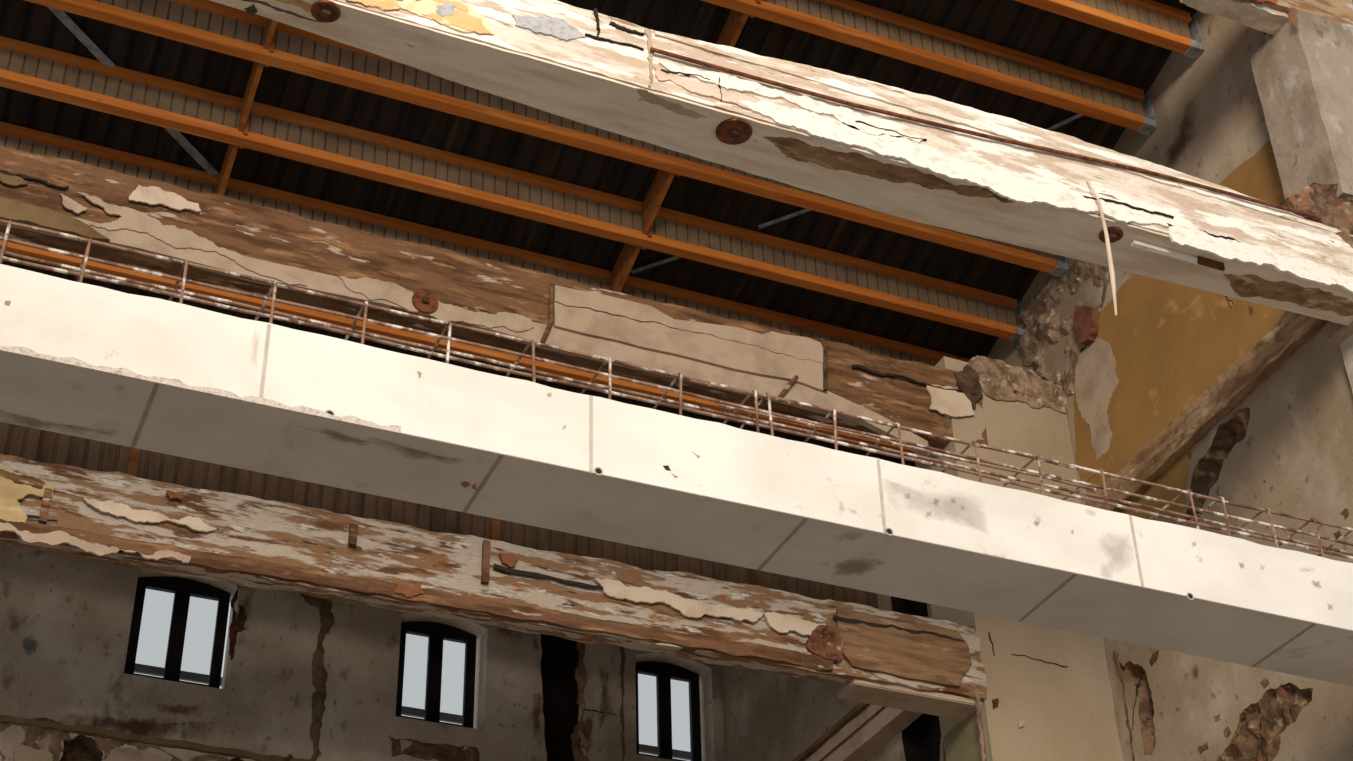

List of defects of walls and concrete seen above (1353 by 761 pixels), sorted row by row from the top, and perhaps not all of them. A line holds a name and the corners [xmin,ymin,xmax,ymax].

crack [585,8,722,102]
peeling [636,62,1353,316]
spalling [981,259,1119,460]
spalling [1184,407,1250,522]
peeling [229,585,248,661]
spalling [0,717,231,761]
spalling [299,593,335,760]
spalling [390,737,480,761]
spalling [570,642,590,761]
crack [1115,656,1143,761]
spalling [1198,678,1313,761]